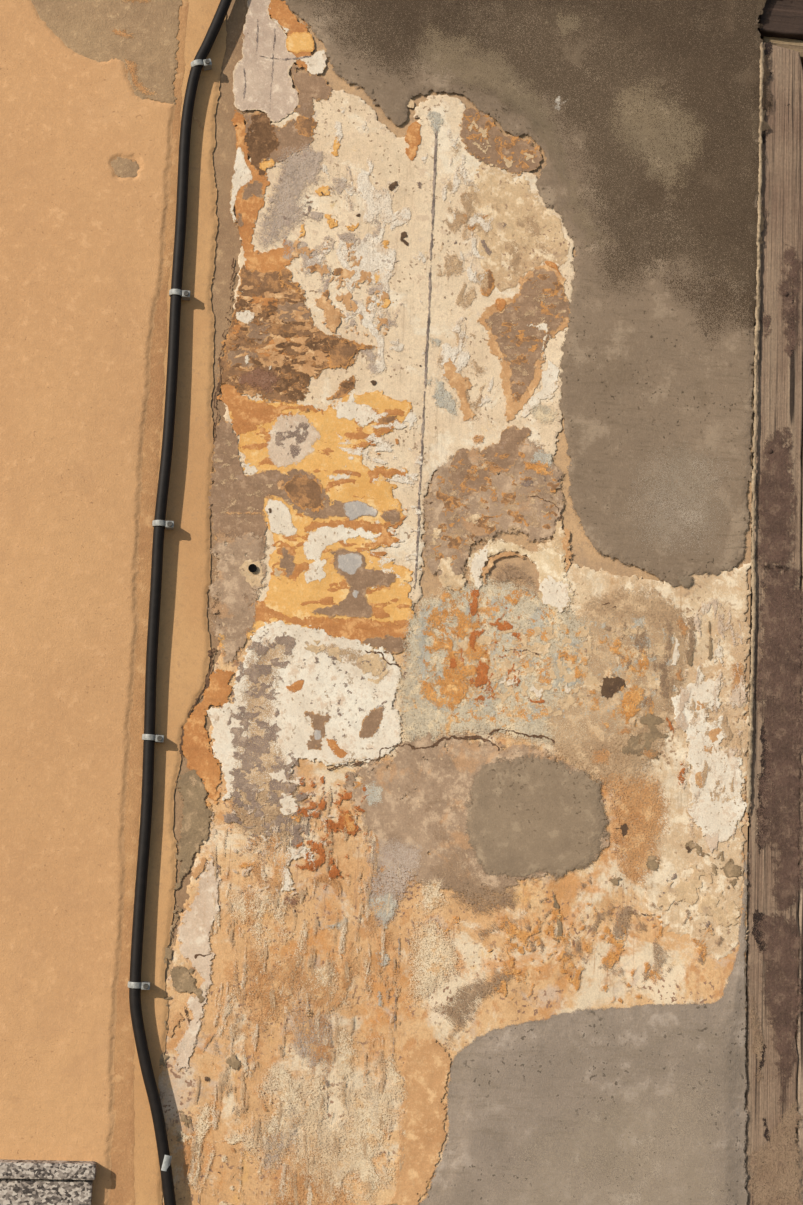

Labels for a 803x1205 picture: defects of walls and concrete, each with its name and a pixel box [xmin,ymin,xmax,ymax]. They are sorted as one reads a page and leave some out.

spalling [31,0,182,104]
peeling [164,0,803,1205]
crack [324,729,555,770]